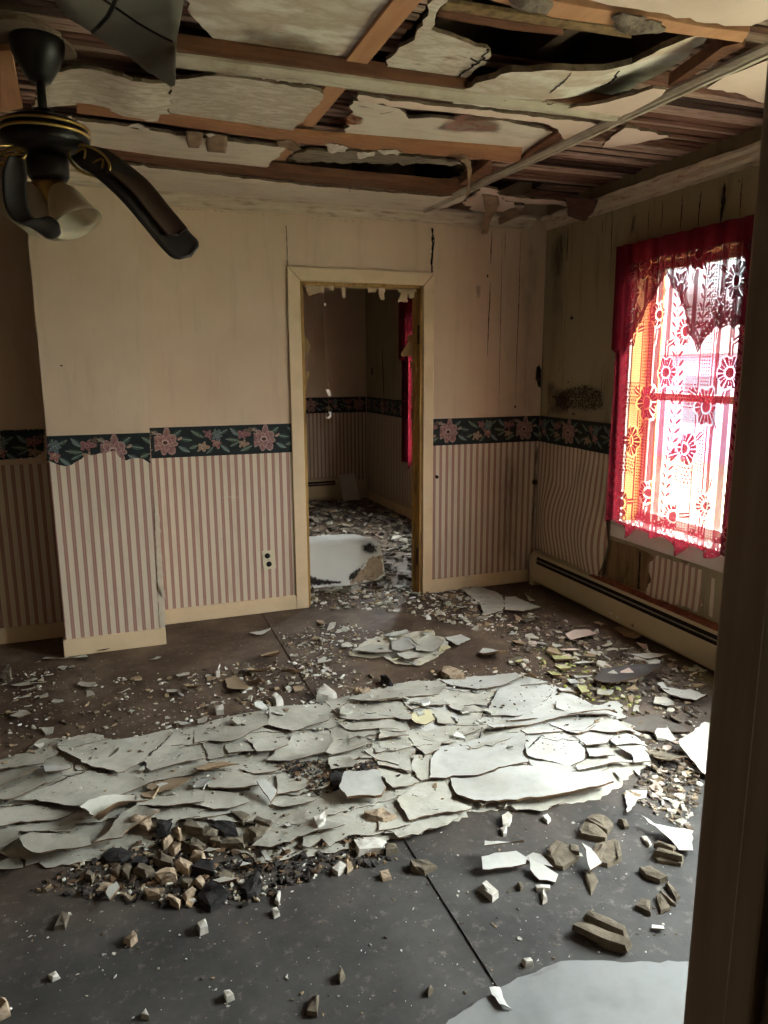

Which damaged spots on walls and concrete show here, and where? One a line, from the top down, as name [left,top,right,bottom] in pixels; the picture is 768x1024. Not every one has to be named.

spalling [325,143,402,159]
crack [428,228,436,272]
damp [536,365,604,415]
peeling [604,540,654,591]